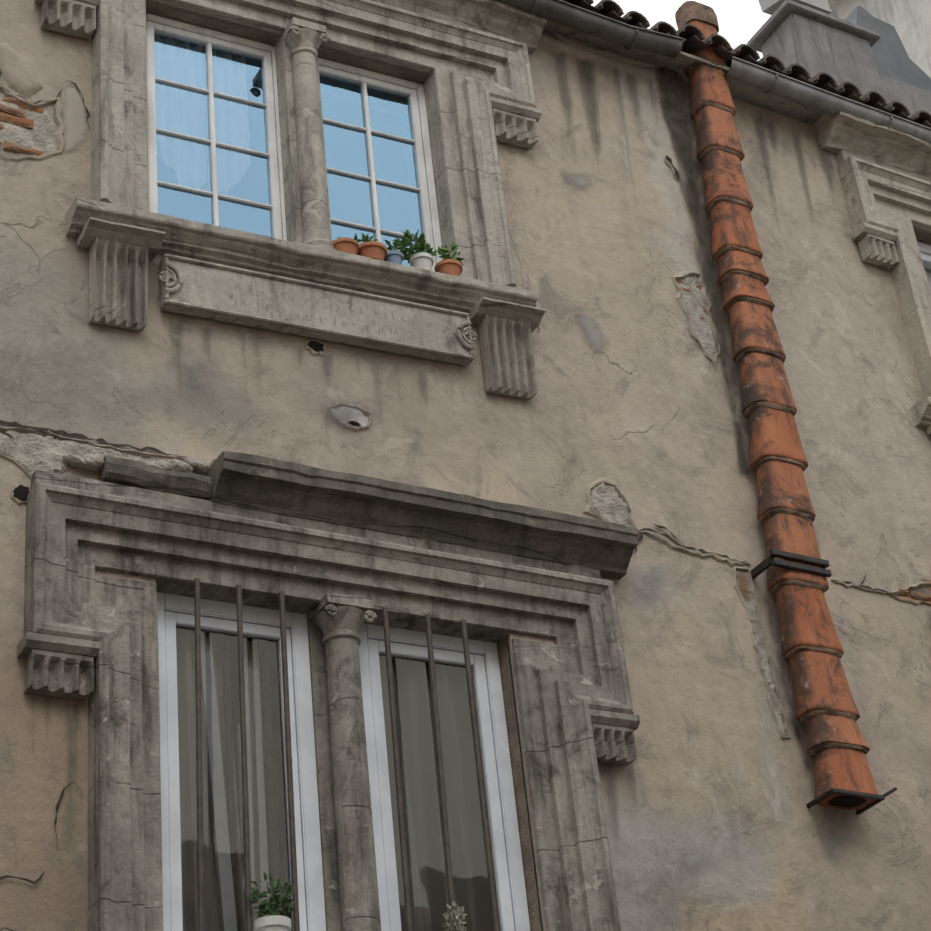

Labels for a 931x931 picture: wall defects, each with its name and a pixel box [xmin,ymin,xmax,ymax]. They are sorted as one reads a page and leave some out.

flaking render [0,80,66,162]
flaking render [671,272,720,371]
peeling [0,426,185,505]
flaking render [582,478,636,528]
crack [831,574,892,595]
crack [54,782,83,847]
crack [0,869,44,885]